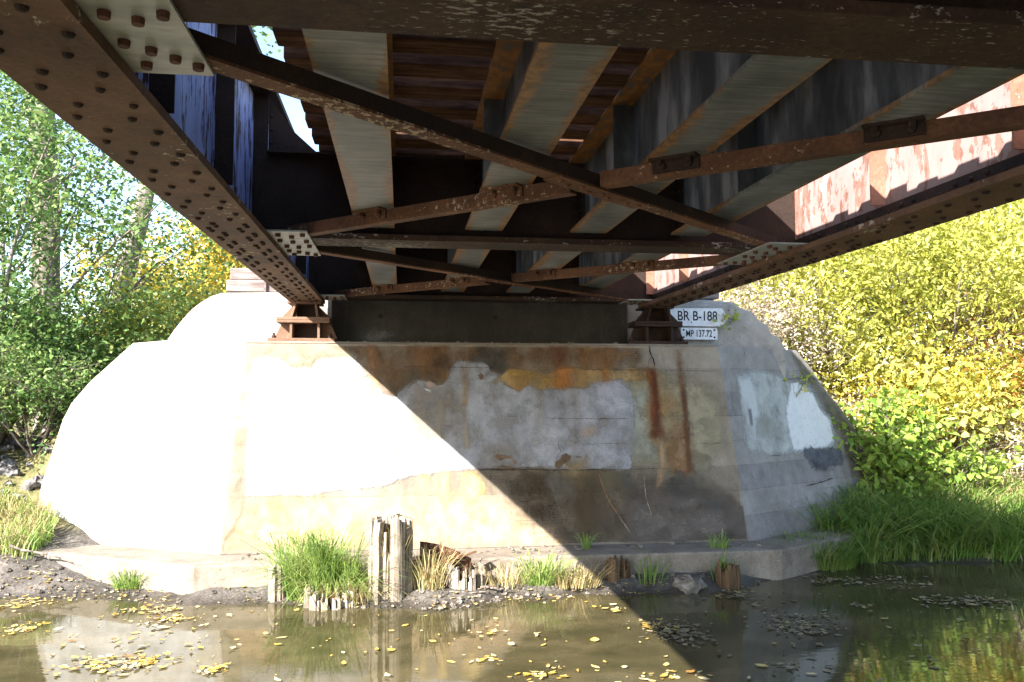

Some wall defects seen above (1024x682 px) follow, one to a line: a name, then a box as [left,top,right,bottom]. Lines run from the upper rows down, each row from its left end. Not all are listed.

peeling [243,355,635,496]
corrosion [647,359,693,485]
peeling [738,370,834,455]
water stain [804,393,863,472]